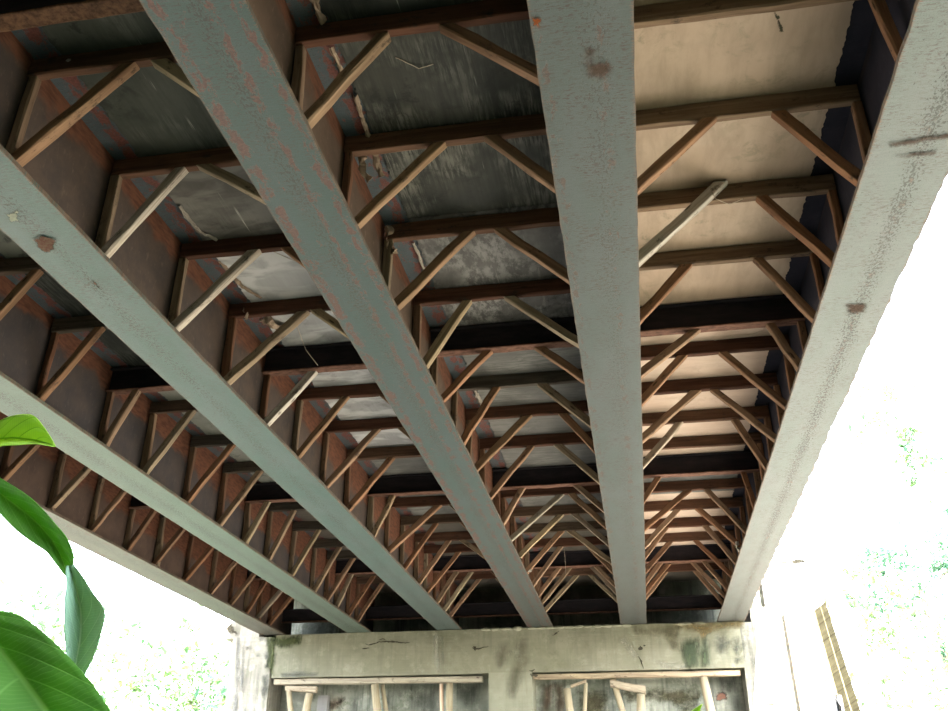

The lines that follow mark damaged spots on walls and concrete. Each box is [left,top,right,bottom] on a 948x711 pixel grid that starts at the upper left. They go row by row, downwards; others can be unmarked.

corrosion [890,134,948,157]
corrosion [846,304,866,314]
leakage [663,627,738,669]